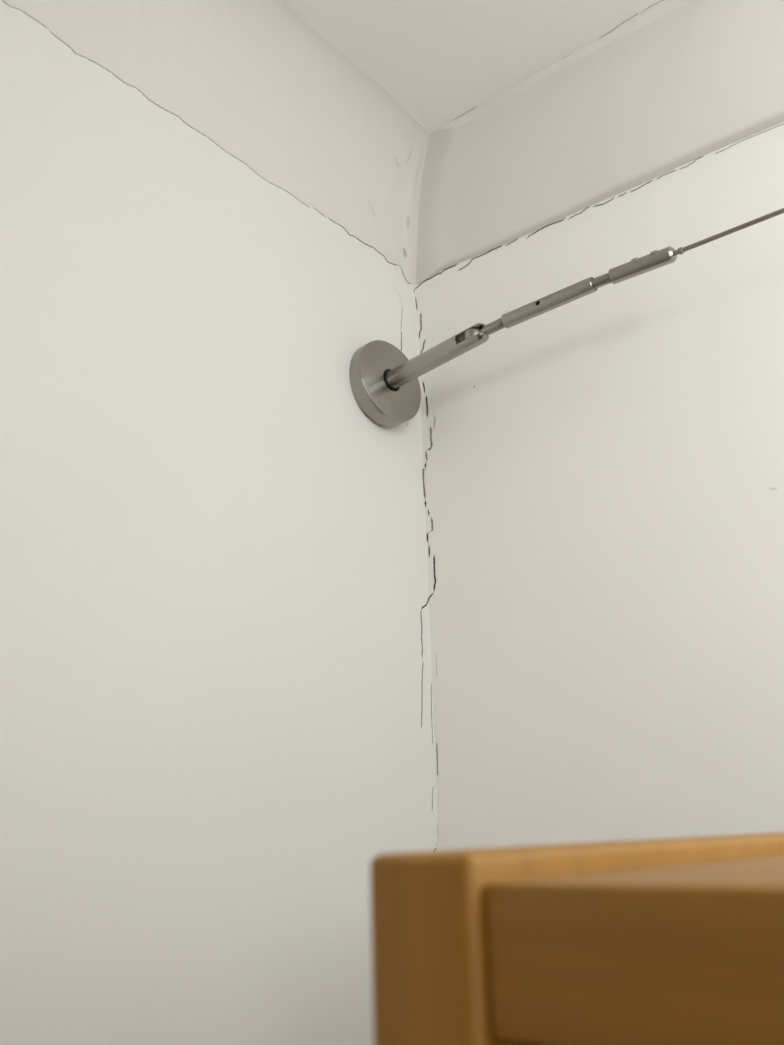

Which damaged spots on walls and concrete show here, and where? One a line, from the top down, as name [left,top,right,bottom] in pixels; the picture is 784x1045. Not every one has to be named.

crack [1,0,784,354]
crack [407,381,439,851]